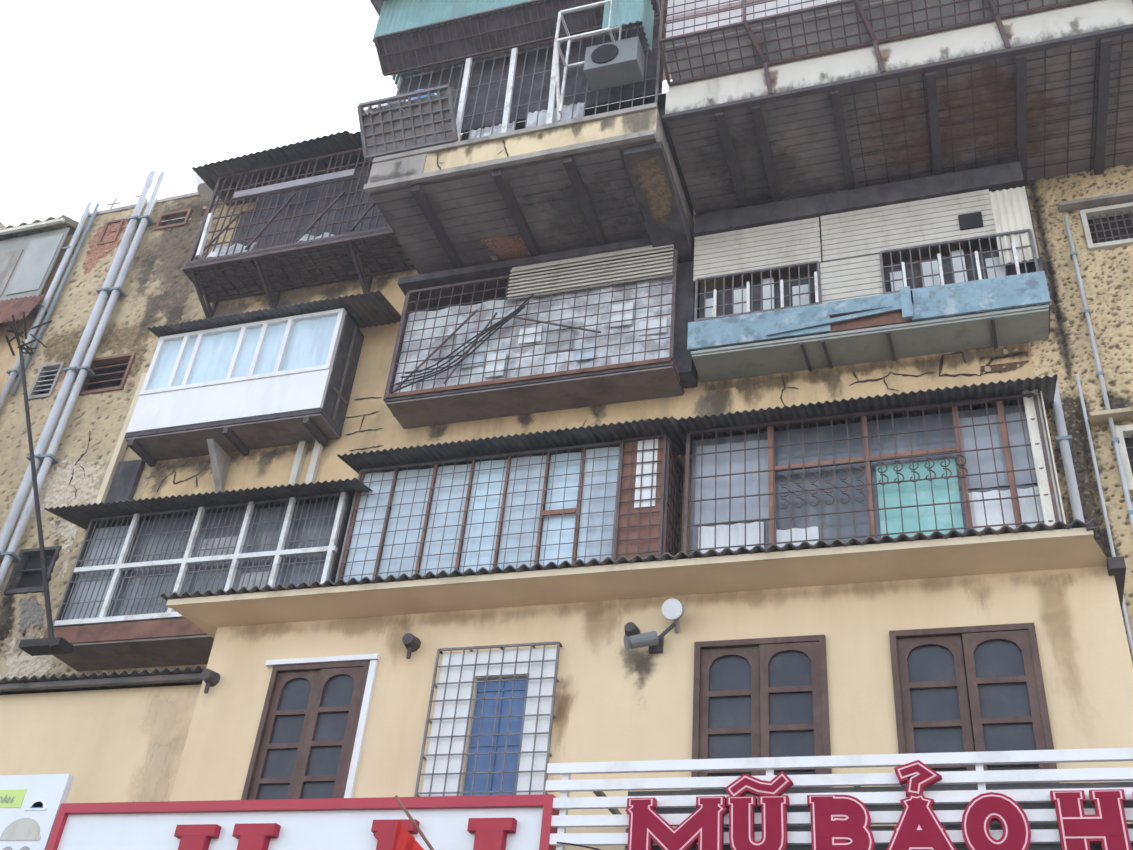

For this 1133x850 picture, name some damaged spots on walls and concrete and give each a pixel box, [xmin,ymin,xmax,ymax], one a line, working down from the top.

crack [849,352,1027,391]
leakage [625,650,653,684]